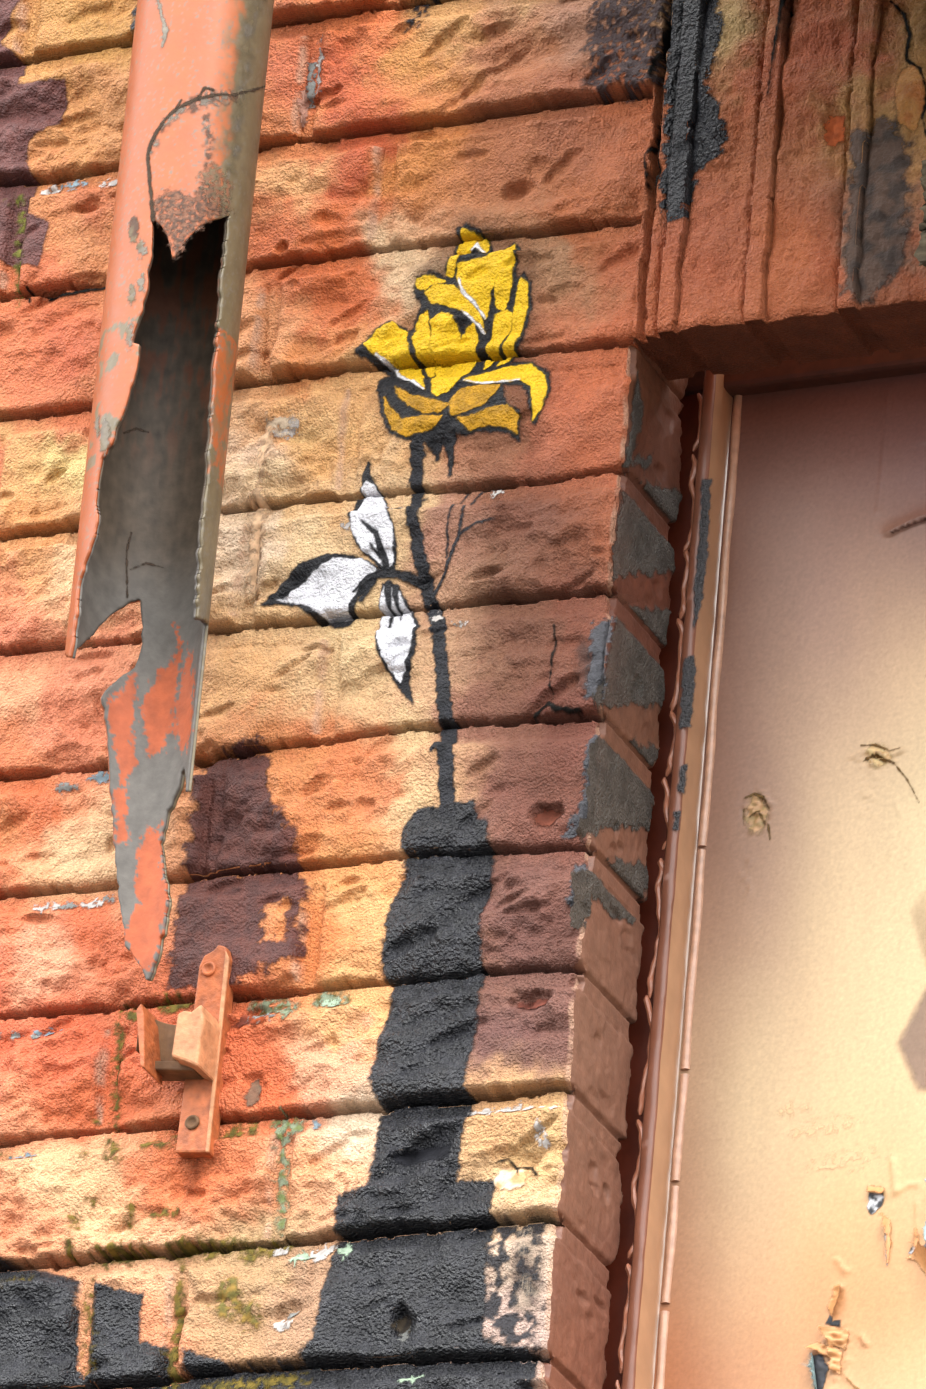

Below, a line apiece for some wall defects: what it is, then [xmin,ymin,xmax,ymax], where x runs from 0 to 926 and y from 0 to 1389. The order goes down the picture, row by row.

crack [890,518,926,533]
peeling [867,1186,891,1263]
peeling [906,1225,926,1274]
peeling [806,1284,849,1389]